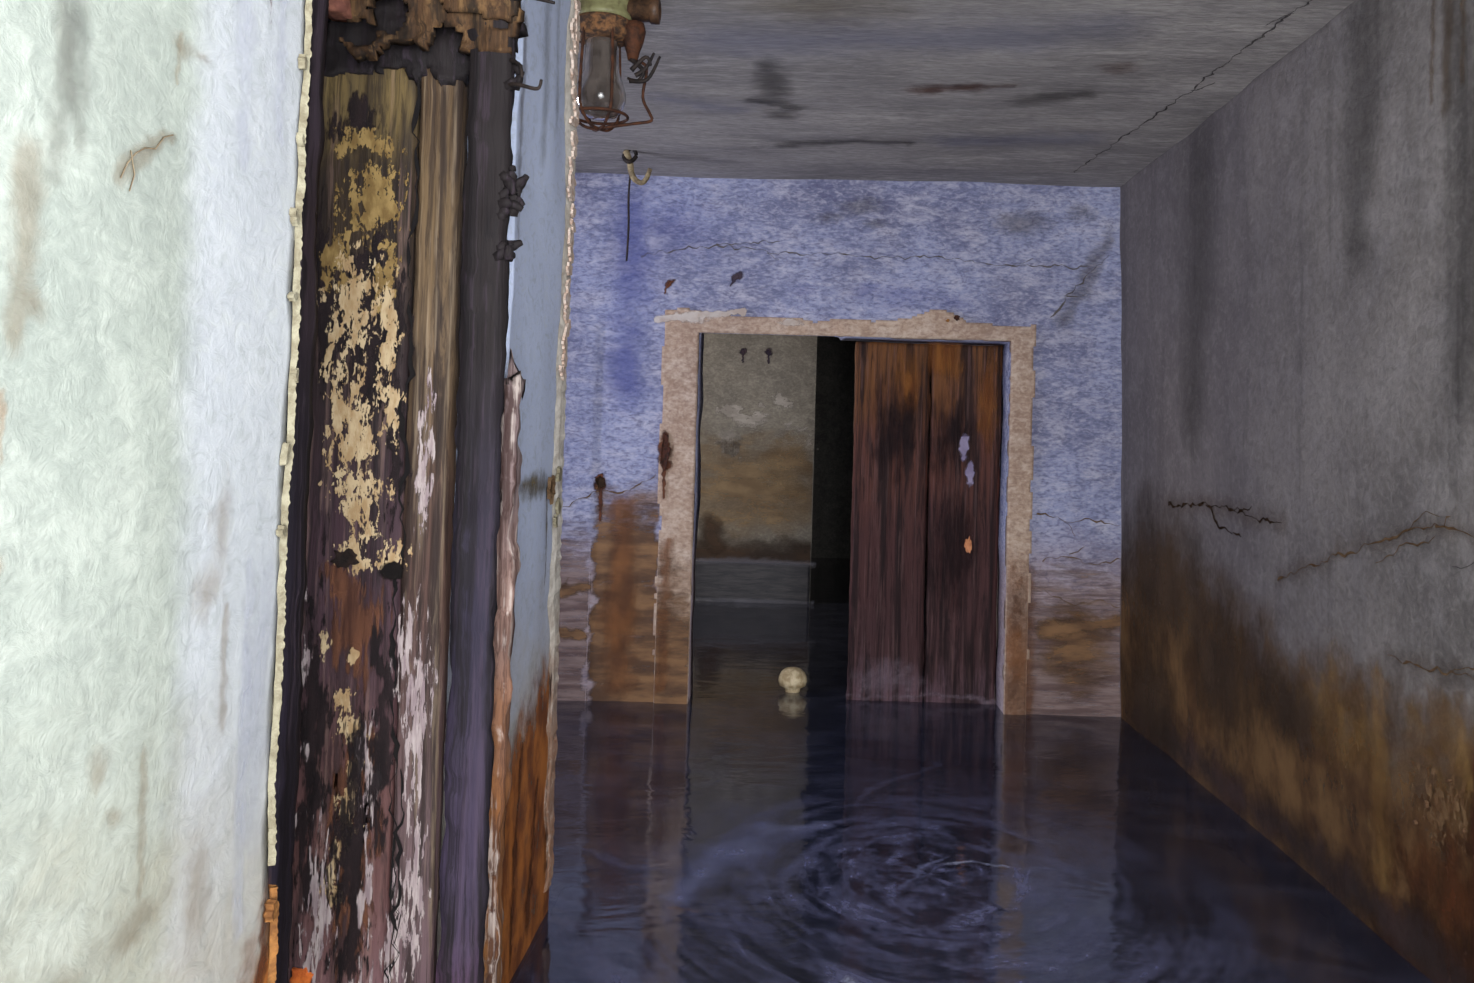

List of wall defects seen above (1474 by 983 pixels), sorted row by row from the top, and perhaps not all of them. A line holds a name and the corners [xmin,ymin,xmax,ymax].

spalling [262,884,279,983]
peeling [267,0,437,866]
peeling [295,597,438,983]
rust [501,667,552,983]
leakage [557,489,689,704]
leakage [1026,510,1306,744]
crack [1168,501,1281,537]
rust [1120,551,1474,983]
crack [1277,511,1473,581]
crack [1390,655,1474,680]